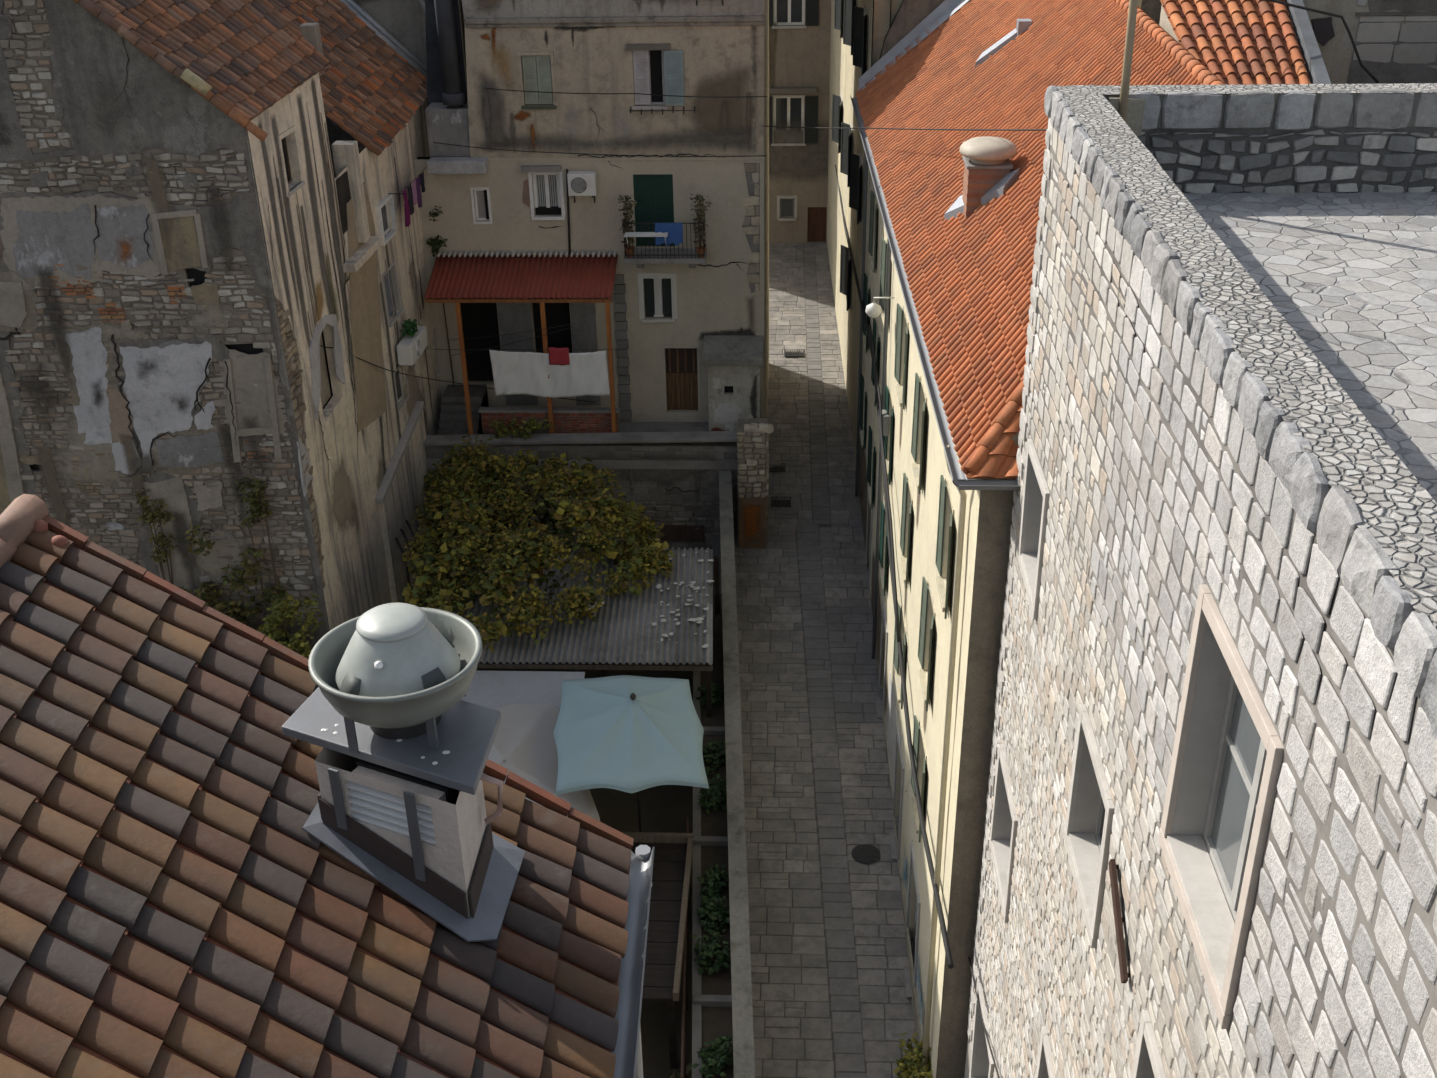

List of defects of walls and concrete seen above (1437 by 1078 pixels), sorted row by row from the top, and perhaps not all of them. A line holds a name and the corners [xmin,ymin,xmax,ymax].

spalling [0,0,387,630]